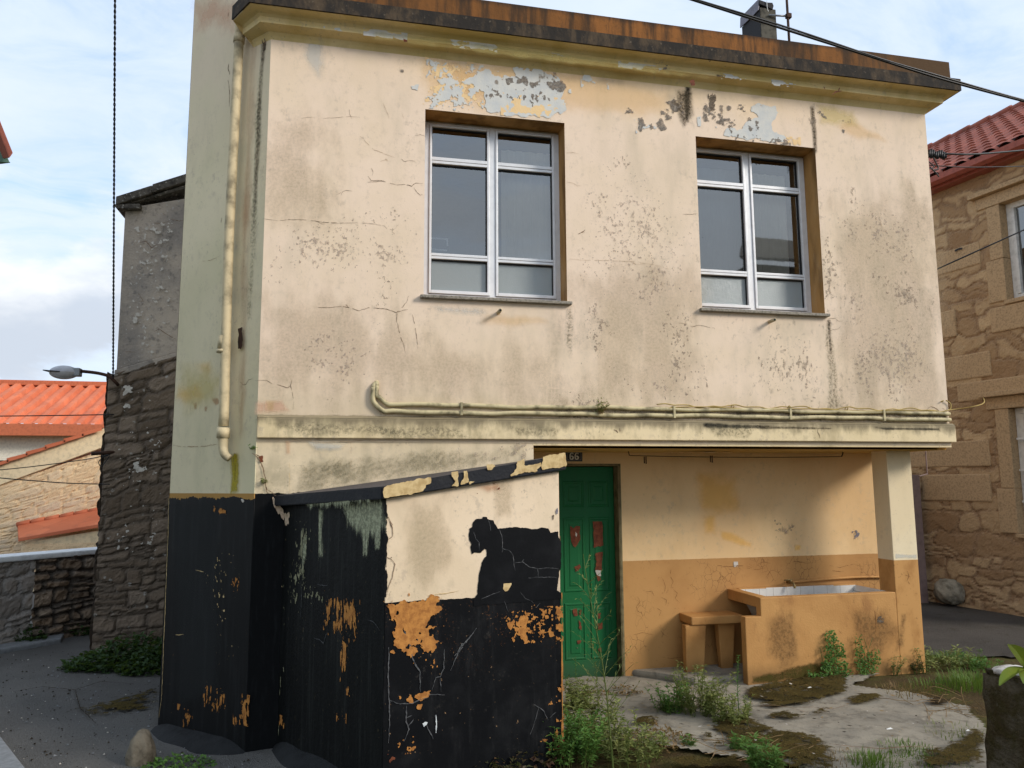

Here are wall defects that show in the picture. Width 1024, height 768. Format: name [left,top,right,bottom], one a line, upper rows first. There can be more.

peeling [411,57,609,118]
spalling [625,97,683,133]
peeling [697,93,801,146]
crack [318,299,418,345]
peeling [451,471,473,487]
peeling [511,450,588,476]
peeling [272,497,356,672]
leakage [344,500,383,555]
peeling [383,477,442,668]
peeling [593,521,603,581]
peeling [506,593,582,759]
peeling [233,695,250,726]